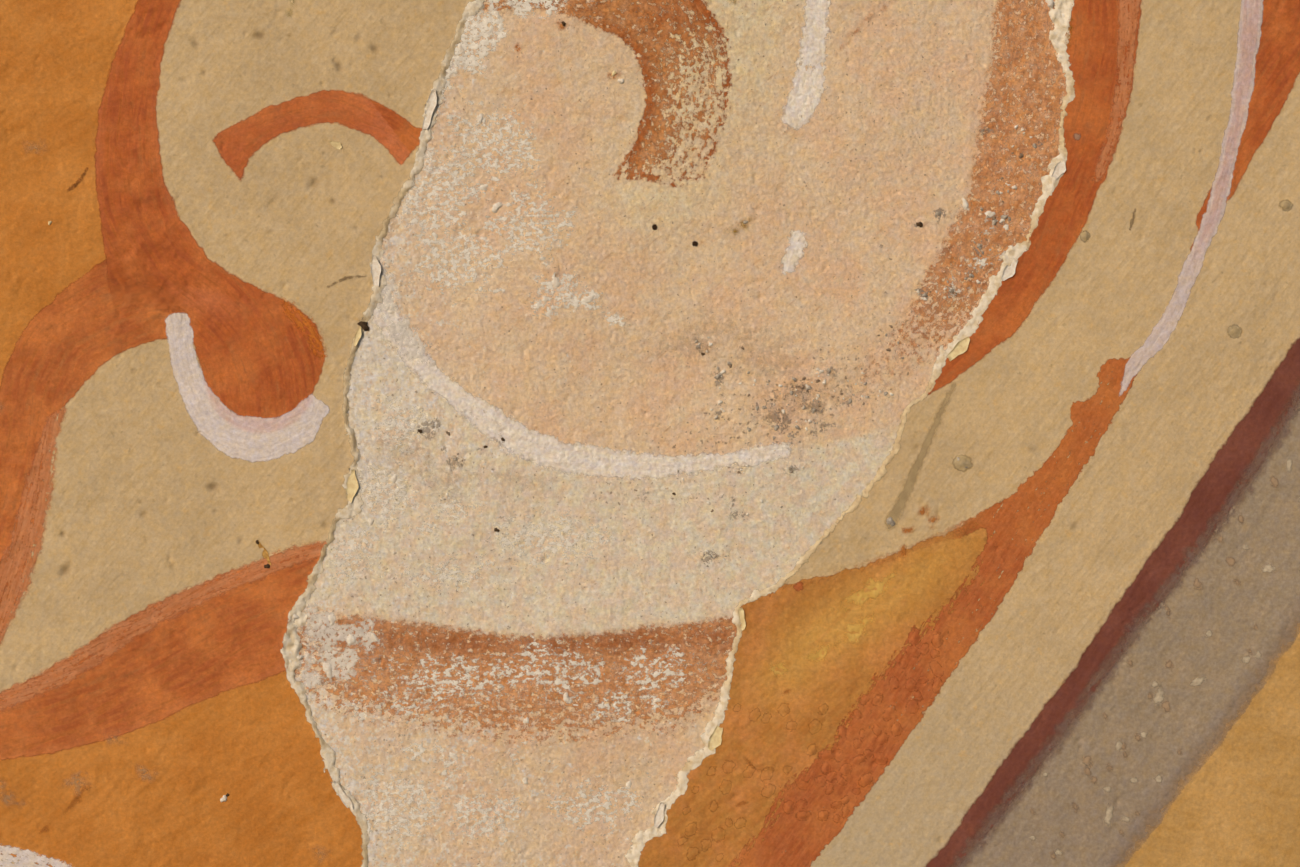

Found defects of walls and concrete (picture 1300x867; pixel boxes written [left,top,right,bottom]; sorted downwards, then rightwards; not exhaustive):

peeling [280,0,1081,867]